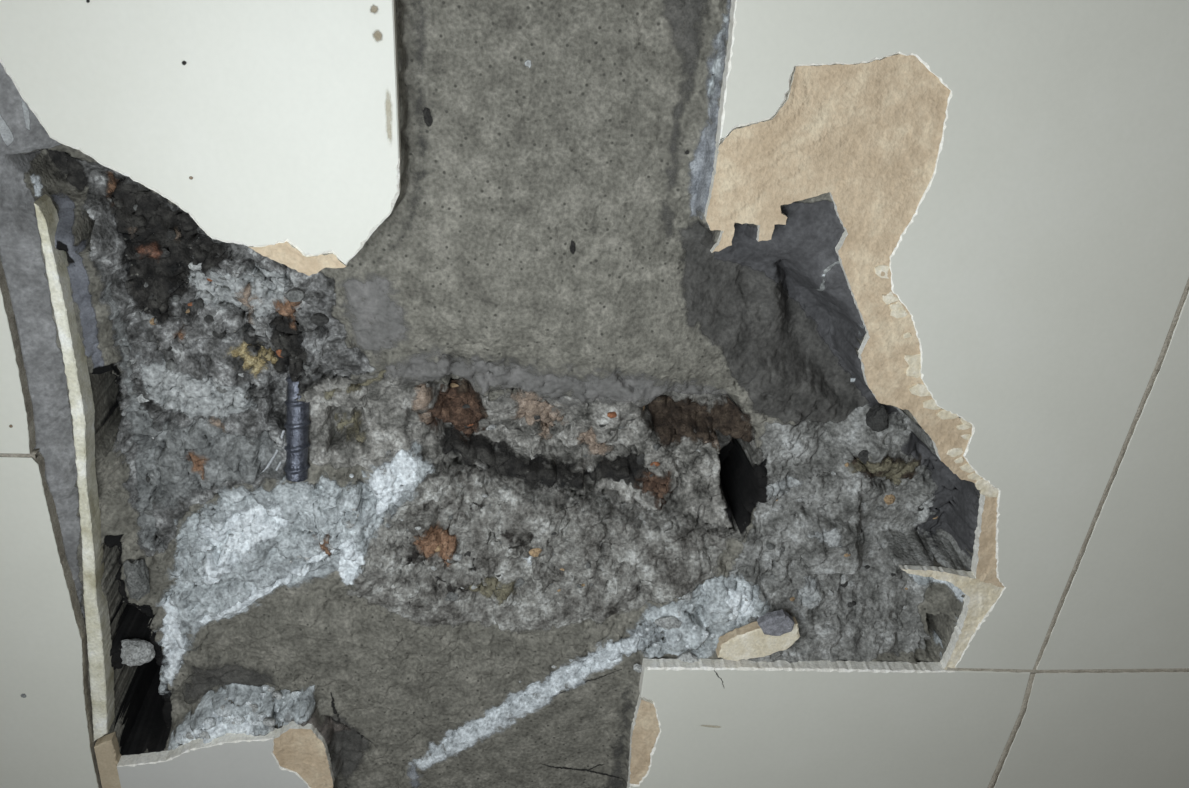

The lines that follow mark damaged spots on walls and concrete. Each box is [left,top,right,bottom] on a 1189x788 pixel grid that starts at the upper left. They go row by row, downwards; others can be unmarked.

spalling [0,0,1006,673]
corrosion [412,382,484,437]
spalling [0,203,108,788]
corrosion [413,524,457,567]
peeling [117,721,335,788]
peeling [628,694,661,788]